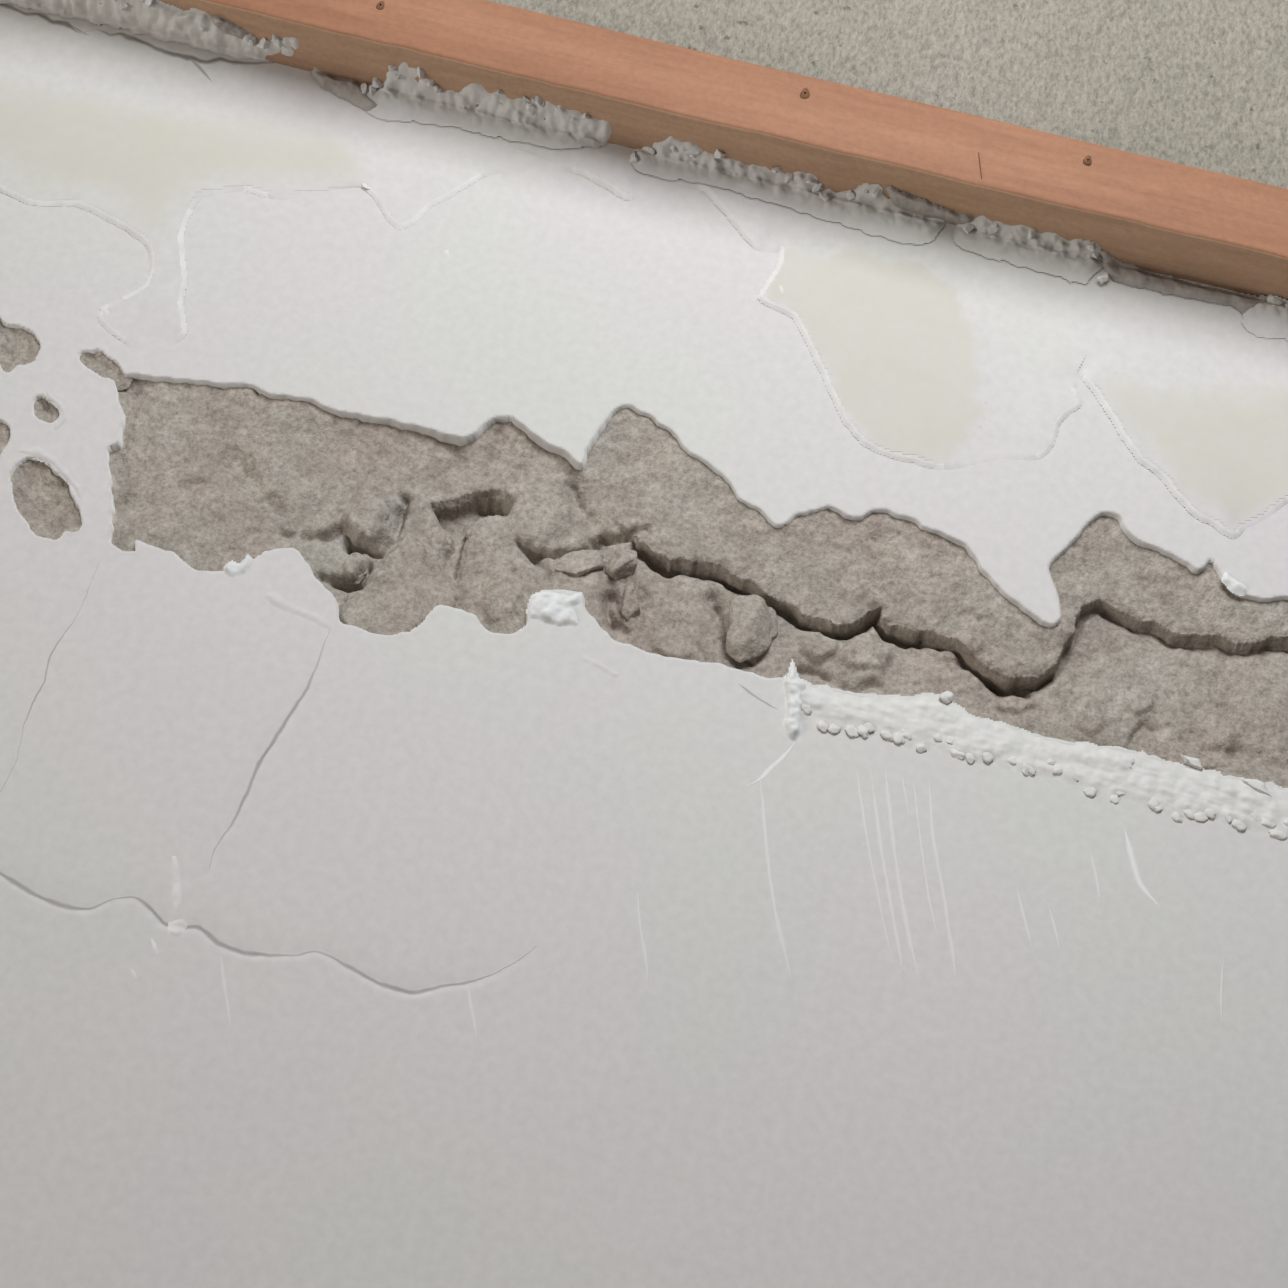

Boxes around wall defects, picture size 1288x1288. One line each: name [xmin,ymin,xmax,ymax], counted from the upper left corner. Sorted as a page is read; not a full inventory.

spalling [0,0,299,61]
spalling [0,319,40,372]
spalling [0,422,84,540]
crack [0,561,100,792]
spalling [34,391,68,430]
spalling [80,351,1288,840]
peeling [309,62,1288,540]
crack [0,628,536,995]